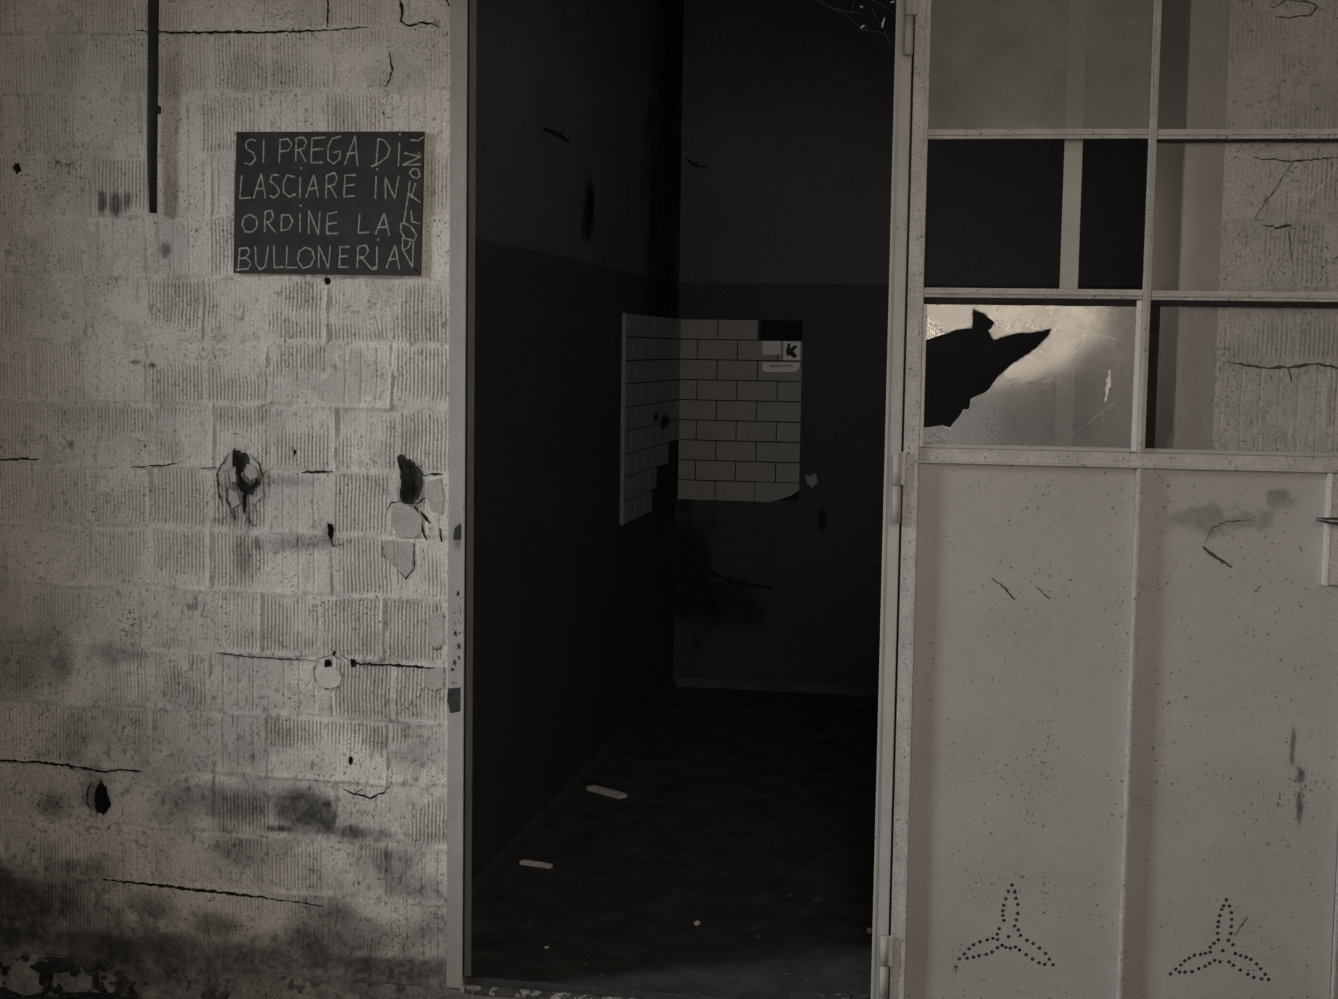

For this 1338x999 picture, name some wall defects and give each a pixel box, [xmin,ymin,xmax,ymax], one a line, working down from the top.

hole [202,448,267,526]
spalling [382,455,444,579]
crack [0,759,141,773]
spalling [86,779,111,815]
crack [103,879,324,907]